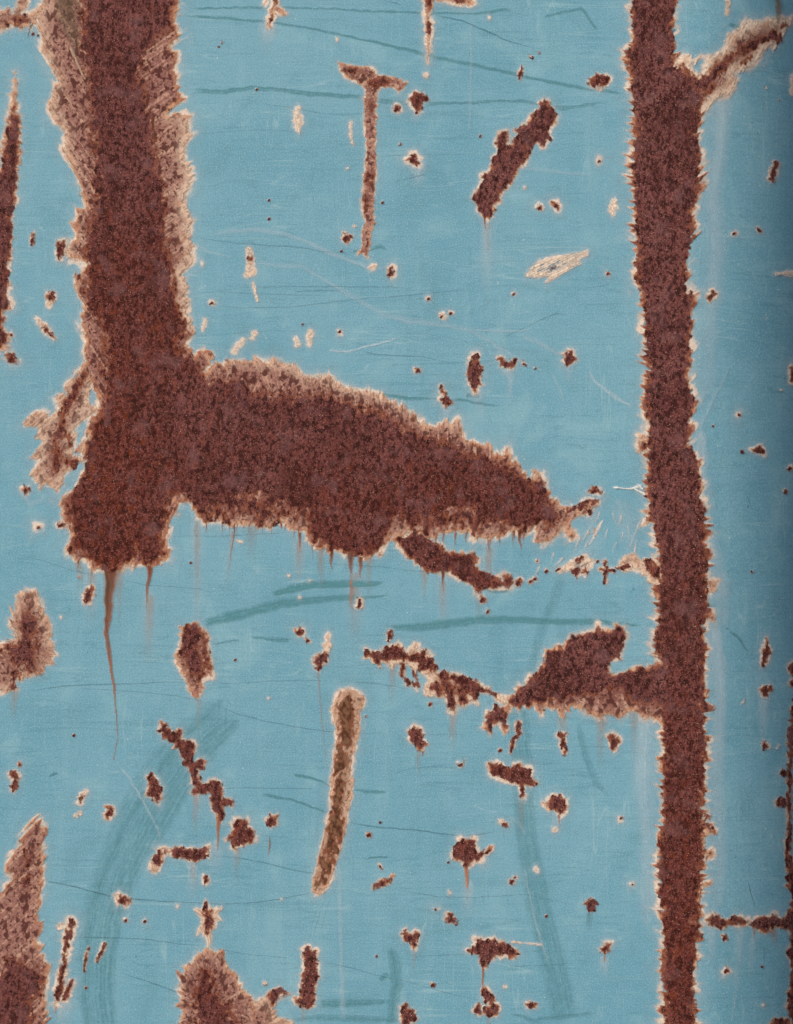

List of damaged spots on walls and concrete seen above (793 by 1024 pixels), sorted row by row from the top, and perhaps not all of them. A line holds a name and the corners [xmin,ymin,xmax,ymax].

corrosion [0,0,605,719]
peeling [526,250,589,283]
corrosion [362,0,793,1024]
corrosion [145,721,278,887]
corrosion [312,687,367,897]
corrosion [0,813,107,1024]
corrosion [175,900,321,1024]